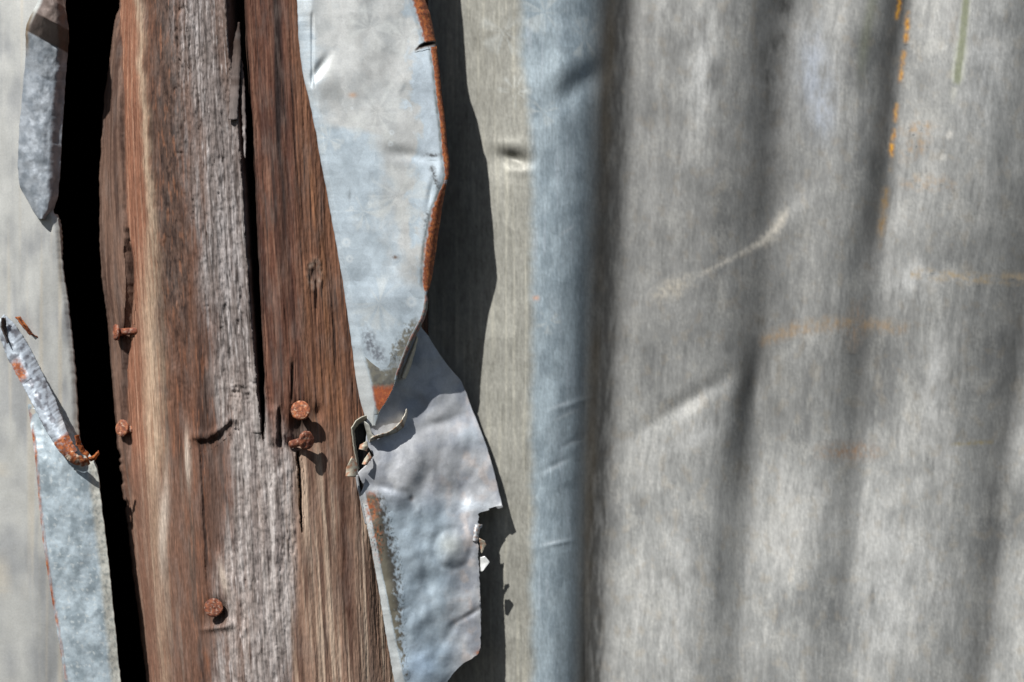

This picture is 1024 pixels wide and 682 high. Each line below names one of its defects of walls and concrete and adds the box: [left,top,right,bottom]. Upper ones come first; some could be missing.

crack [224,0,304,534]
rust [370,0,450,414]
rust [53,431,77,456]
peeling [358,313,421,414]
peeling [373,490,410,682]